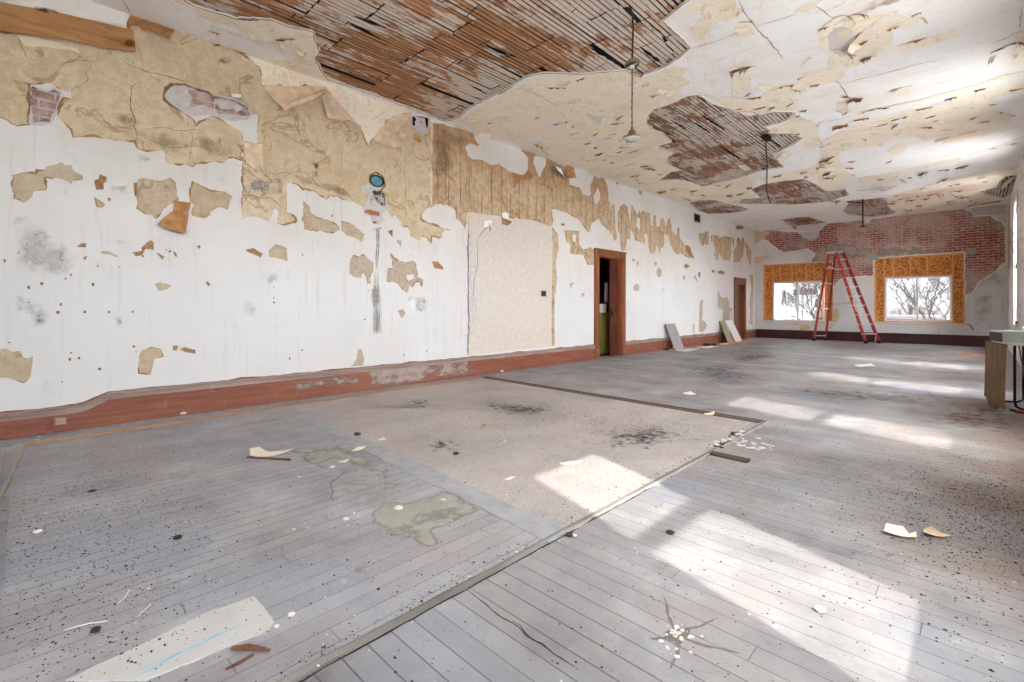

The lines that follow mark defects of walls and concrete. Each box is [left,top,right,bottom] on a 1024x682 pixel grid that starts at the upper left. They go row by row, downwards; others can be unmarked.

peeling [0,0,175,53]
flaking render [27,84,64,126]
peeling [162,0,1024,303]
peeling [11,162,111,208]
peeling [134,178,233,233]
peeling [297,349,469,389]
damp [293,447,478,546]
crack [466,589,575,667]